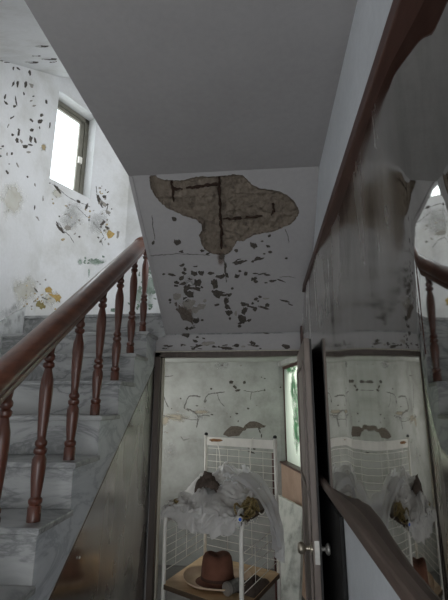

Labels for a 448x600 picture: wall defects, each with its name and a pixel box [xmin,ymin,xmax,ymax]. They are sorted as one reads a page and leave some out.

peeling [4,55,57,108]
peeling [7,113,51,153]
peeling [56,200,94,241]
peeling [96,186,120,245]
spalling [149,174,299,350]
crack [163,392,225,428]
peeling [223,413,265,438]